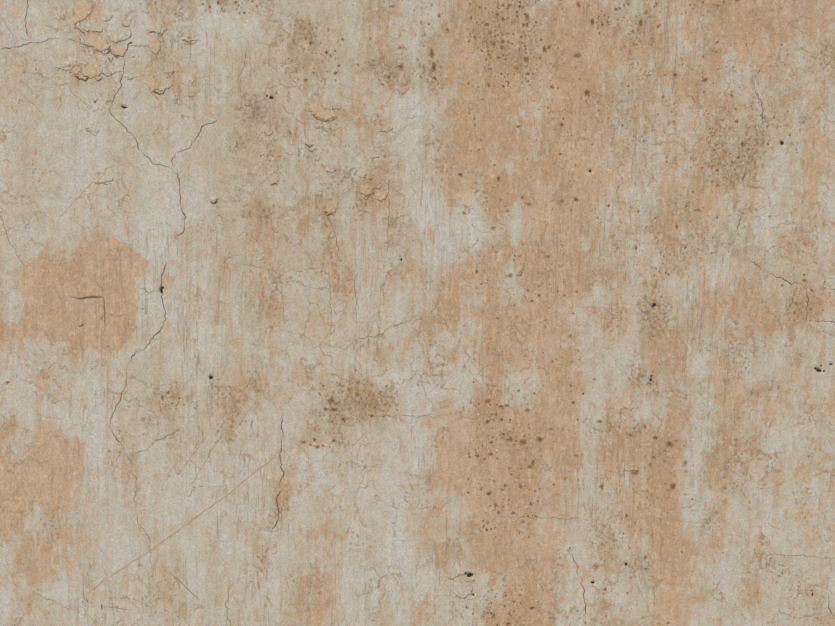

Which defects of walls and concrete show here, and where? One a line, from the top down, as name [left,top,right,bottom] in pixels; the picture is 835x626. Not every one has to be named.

spalling [55,0,194,103]
crack [109,62,218,235]
crack [110,265,176,466]
crack [272,416,284,529]